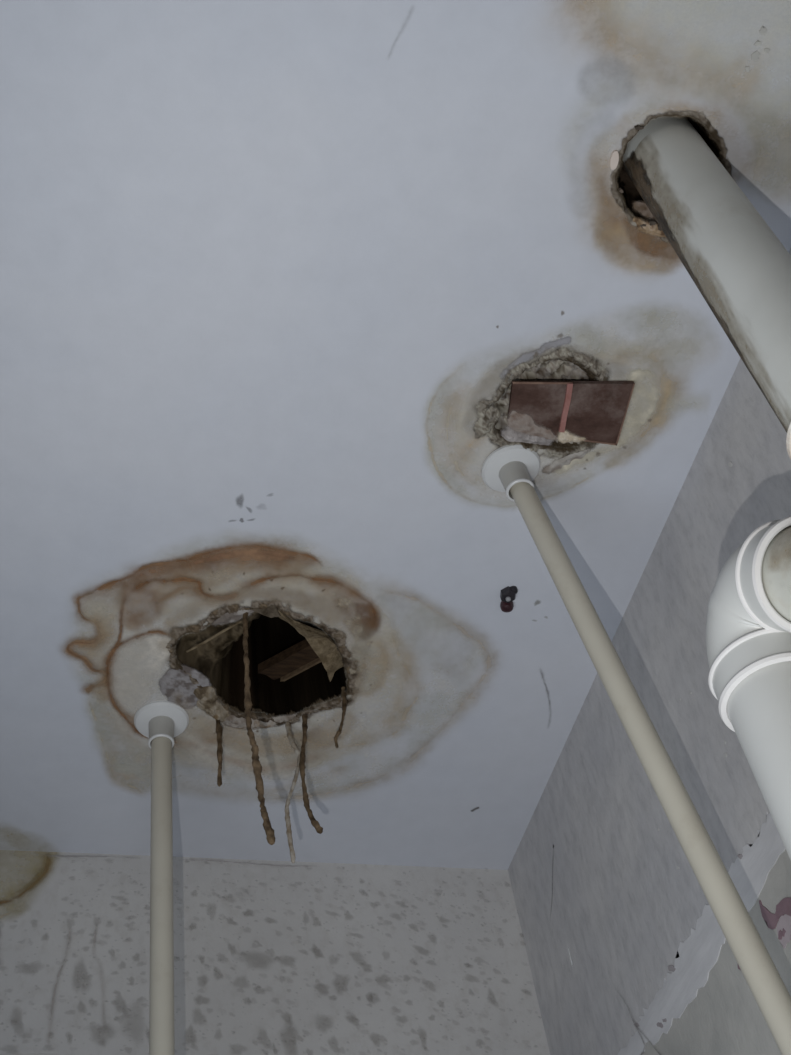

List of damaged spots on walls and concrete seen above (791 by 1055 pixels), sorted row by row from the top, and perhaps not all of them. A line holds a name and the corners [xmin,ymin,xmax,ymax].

leakage [600,196,678,267]
hole [609,111,732,242]
spalling [474,337,609,474]
leakage [594,352,677,449]
rust [65,545,398,789]
hole [159,599,358,730]
leakage [0,850,56,918]